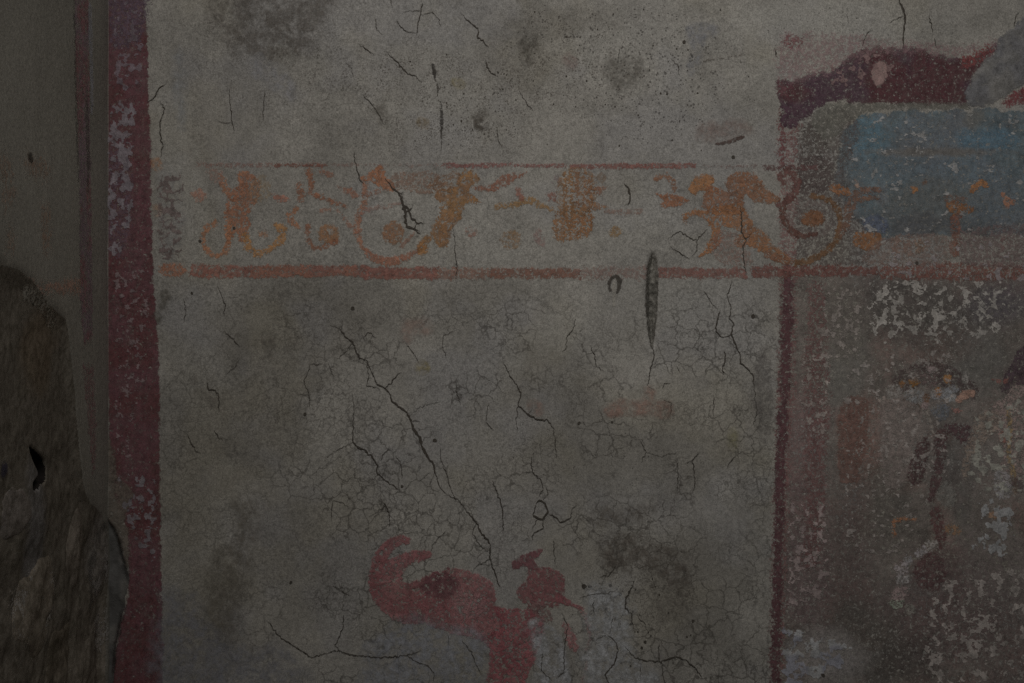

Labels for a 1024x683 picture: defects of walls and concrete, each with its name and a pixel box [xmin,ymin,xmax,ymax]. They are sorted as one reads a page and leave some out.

peeling [107,0,144,256]
crack [354,153,424,234]
crack [348,4,496,121]
peeling [114,270,149,429]
peeling [118,474,158,558]
crack [302,325,508,586]
crack [503,363,575,561]
crack [707,206,757,423]
peeling [799,228,1024,557]
crack [268,585,434,680]
crack [541,614,568,678]
crack [583,567,702,683]